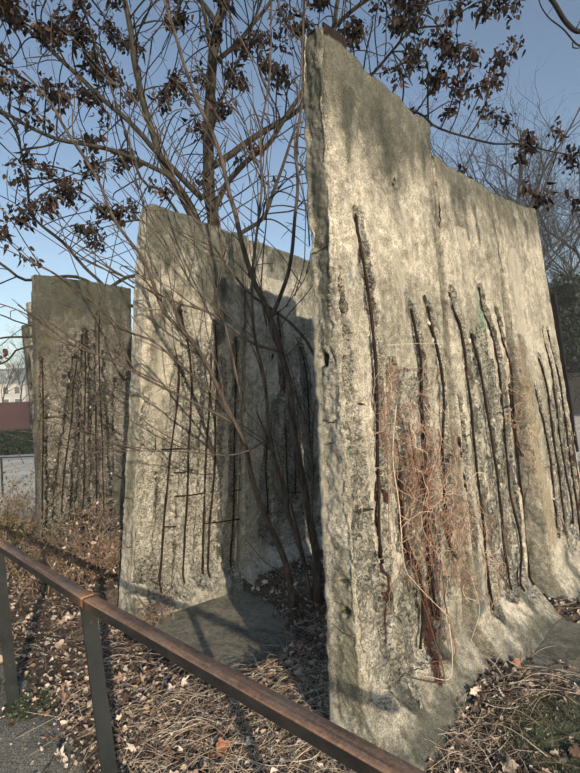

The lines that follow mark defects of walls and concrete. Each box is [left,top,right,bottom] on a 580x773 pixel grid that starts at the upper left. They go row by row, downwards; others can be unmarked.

spalling [38,310,130,547]
spalling [130,300,242,614]
spalling [256,312,321,547]
rust [379,561,393,647]
rust [374,455,403,532]
rust [398,513,412,569]
spalling [321,204,544,715]